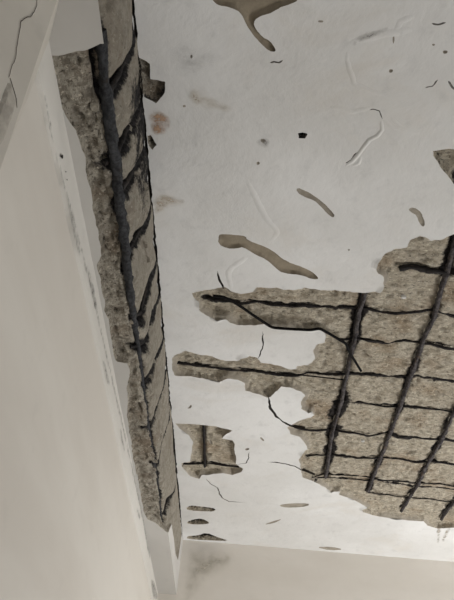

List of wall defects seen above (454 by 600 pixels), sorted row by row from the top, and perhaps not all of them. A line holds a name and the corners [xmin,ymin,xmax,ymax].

crack [9,6,37,106]
corrosion [154,114,166,133]
spalling [52,0,243,559]
spalling [172,234,454,529]